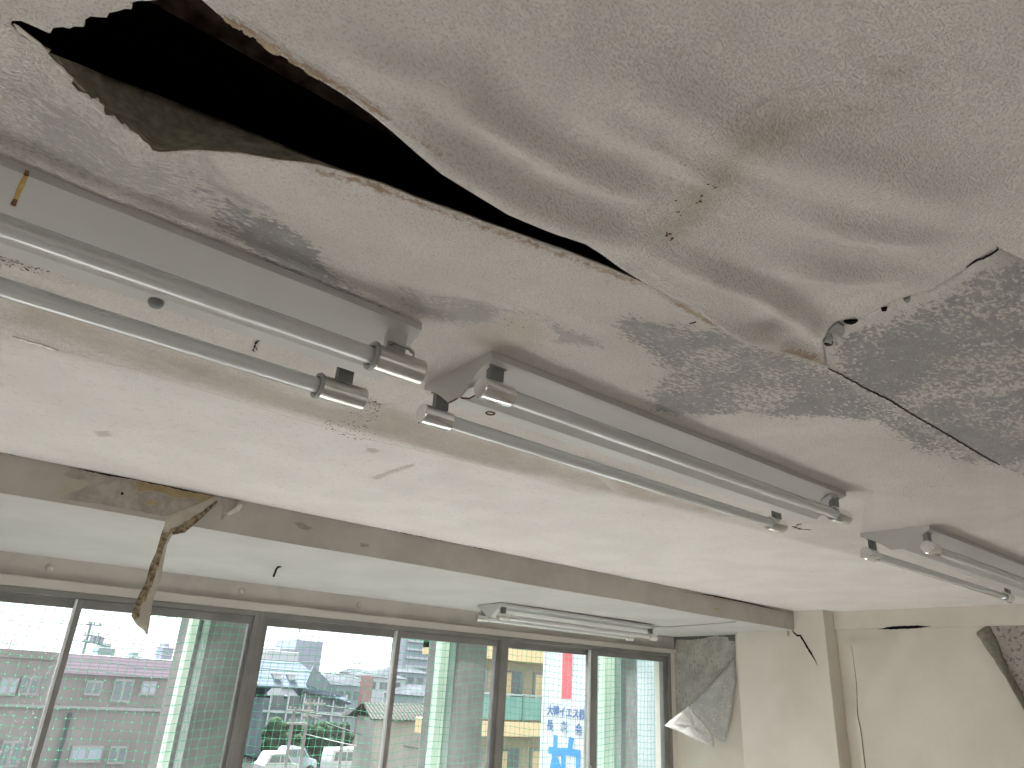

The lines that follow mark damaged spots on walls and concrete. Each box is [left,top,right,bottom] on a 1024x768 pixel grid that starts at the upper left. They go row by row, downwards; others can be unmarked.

peeling [0,42,507,328]
crack [966,247,999,268]
crack [828,368,999,465]
peeling [56,468,243,636]
flaking render [665,635,736,747]
crack [792,630,817,664]
flaking render [990,625,1024,696]